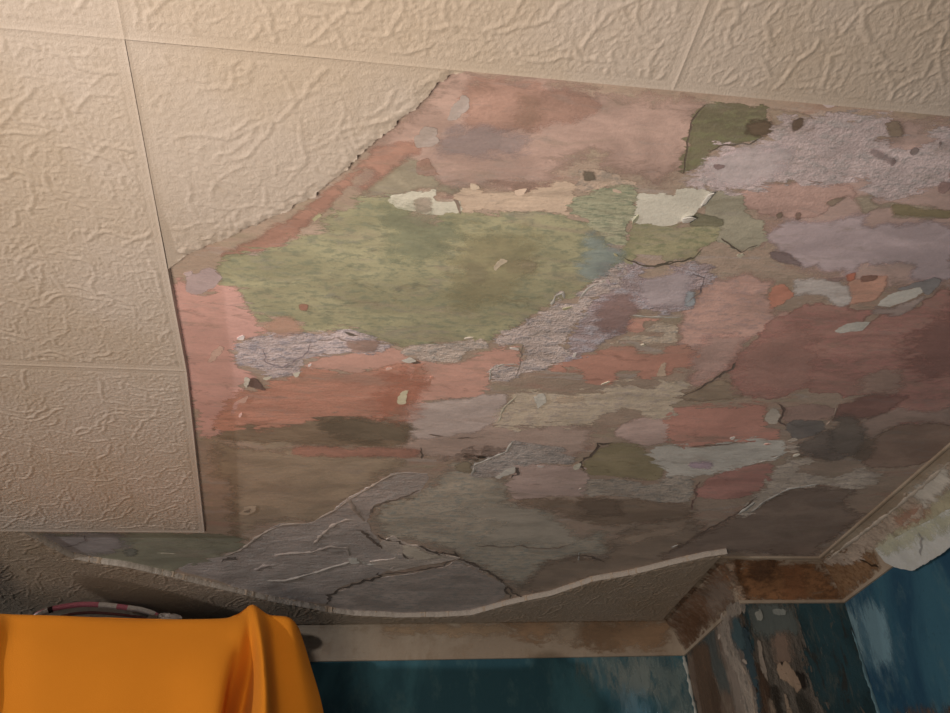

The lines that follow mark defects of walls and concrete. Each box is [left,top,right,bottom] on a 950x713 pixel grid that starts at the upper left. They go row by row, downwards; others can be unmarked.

peeling [23,71,950,618]
crack [378,535,604,598]